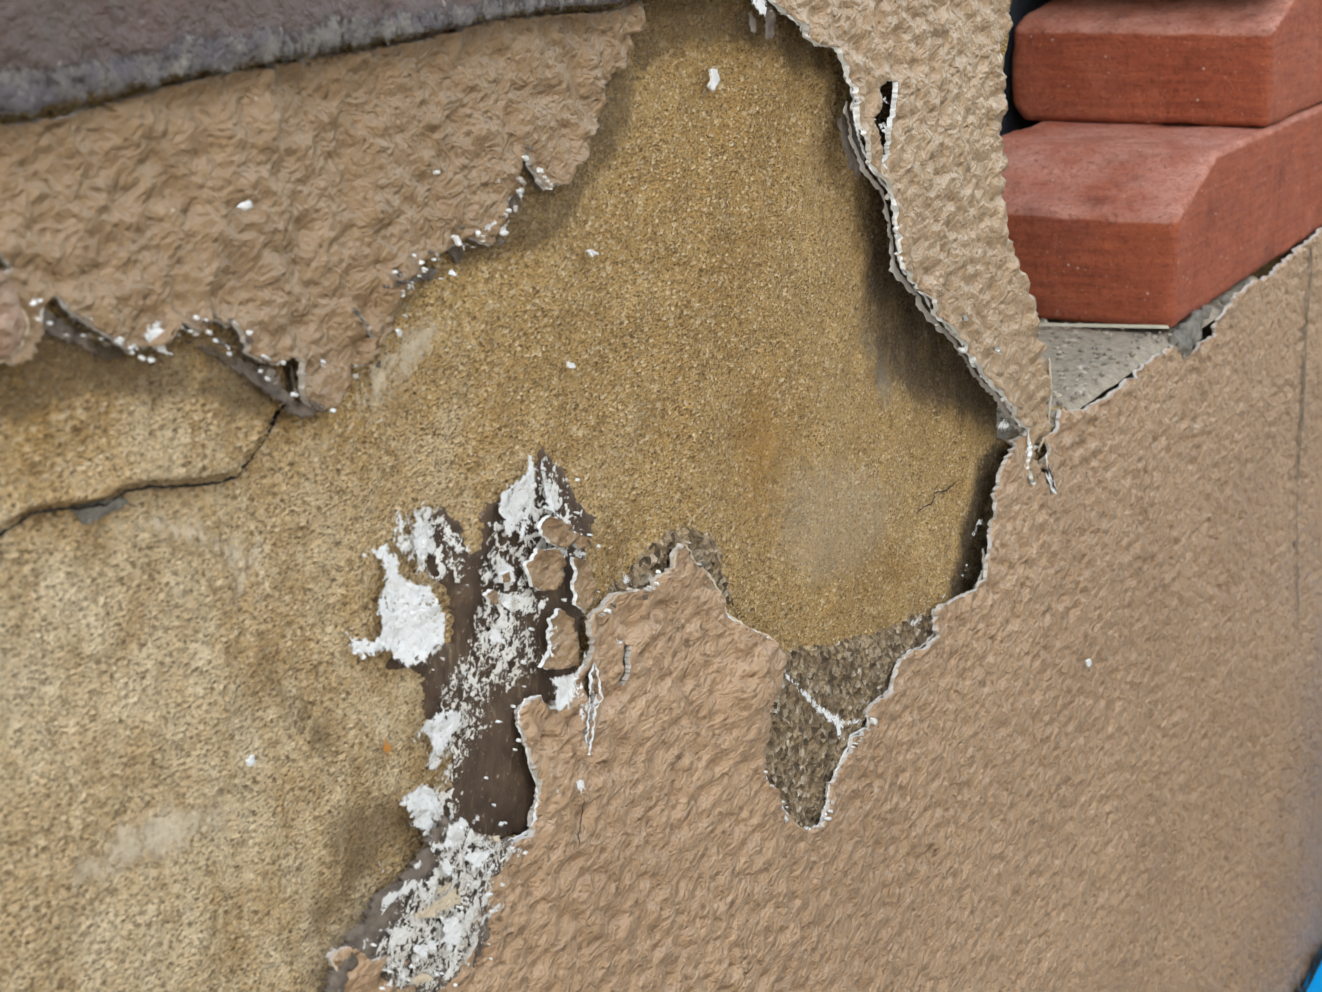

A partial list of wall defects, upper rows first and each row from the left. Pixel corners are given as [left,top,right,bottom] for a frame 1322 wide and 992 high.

crack [0,404,284,537]
peeling [25,295,336,419]
peeling [321,0,1052,992]
crack [1296,245,1313,629]